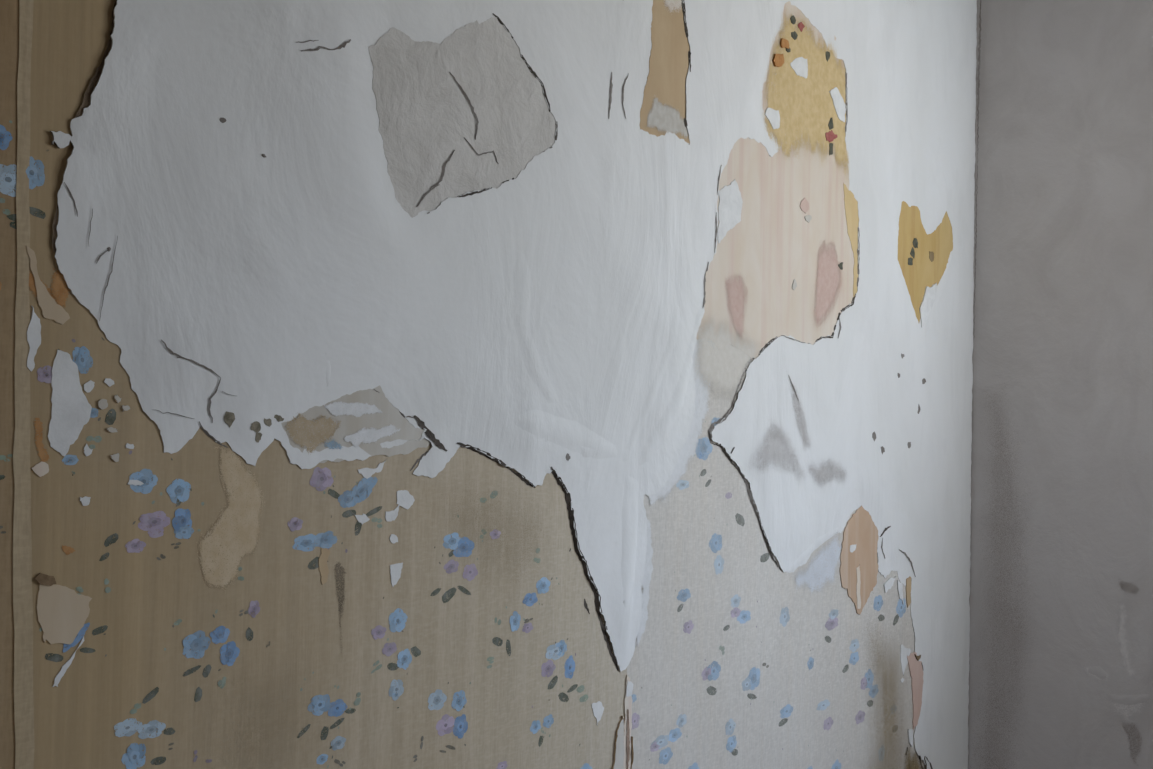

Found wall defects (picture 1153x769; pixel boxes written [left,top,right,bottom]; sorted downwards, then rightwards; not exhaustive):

peeling [49,131,71,148]
flaking render [368,17,556,218]
peeling [640,0,690,144]
peeling [693,1,859,403]
peeling [898,201,953,328]
peeling [48,350,130,456]
flaking render [224,411,235,428]
flaking render [251,385,430,479]
peeling [385,490,415,543]
peeling [840,505,911,615]
peeling [35,573,92,687]
peeling [900,644,933,769]